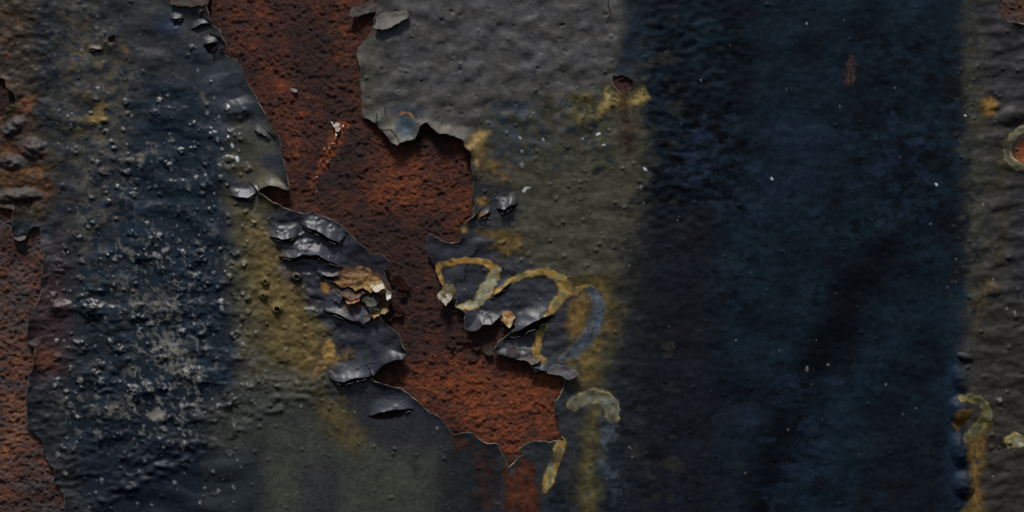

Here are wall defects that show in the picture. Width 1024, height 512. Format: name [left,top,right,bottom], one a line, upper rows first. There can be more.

peeling [0,79,16,118]
damp [76,103,108,138]
damp [572,88,649,123]
peeling [170,0,580,467]
rust [334,267,389,319]
peeling [0,189,65,512]
damp [153,338,199,392]
damp [146,408,166,421]
rust [503,457,539,512]